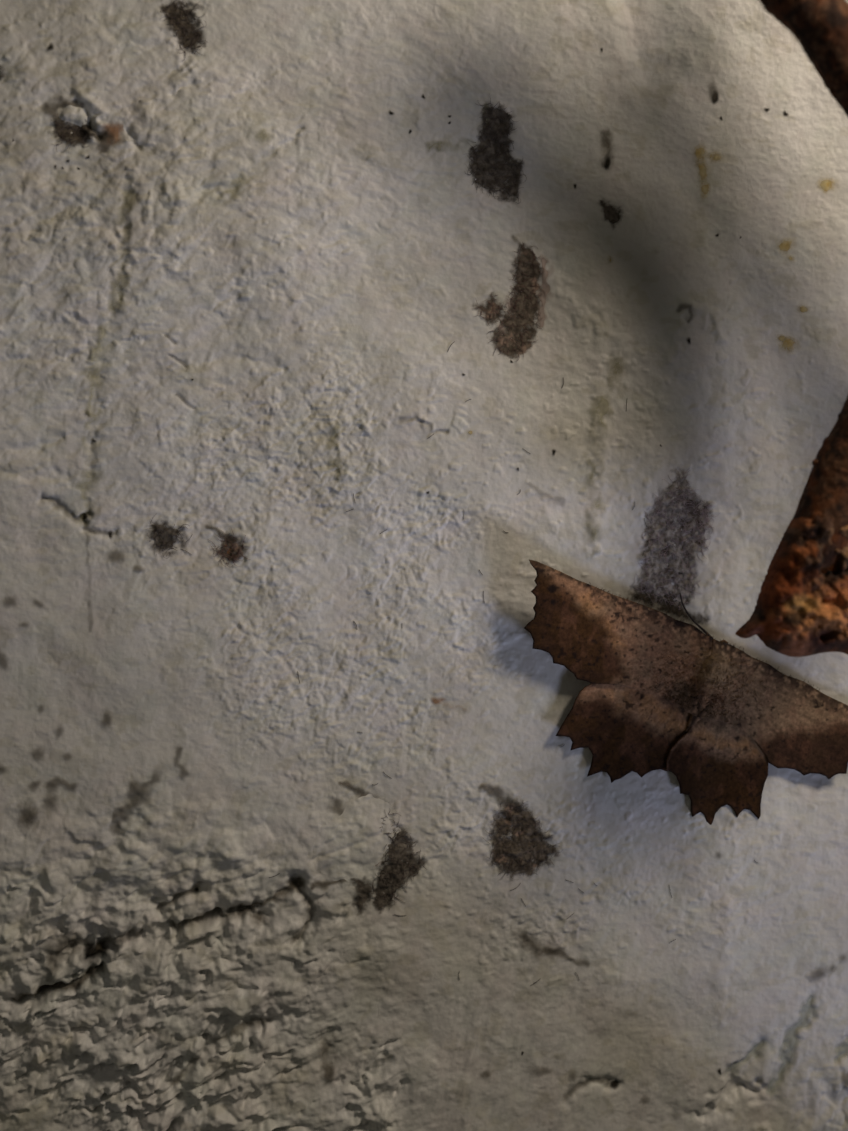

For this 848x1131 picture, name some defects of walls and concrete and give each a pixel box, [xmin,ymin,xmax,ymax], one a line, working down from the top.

crack [239,878,303,913]
crack [12,964,103,1002]